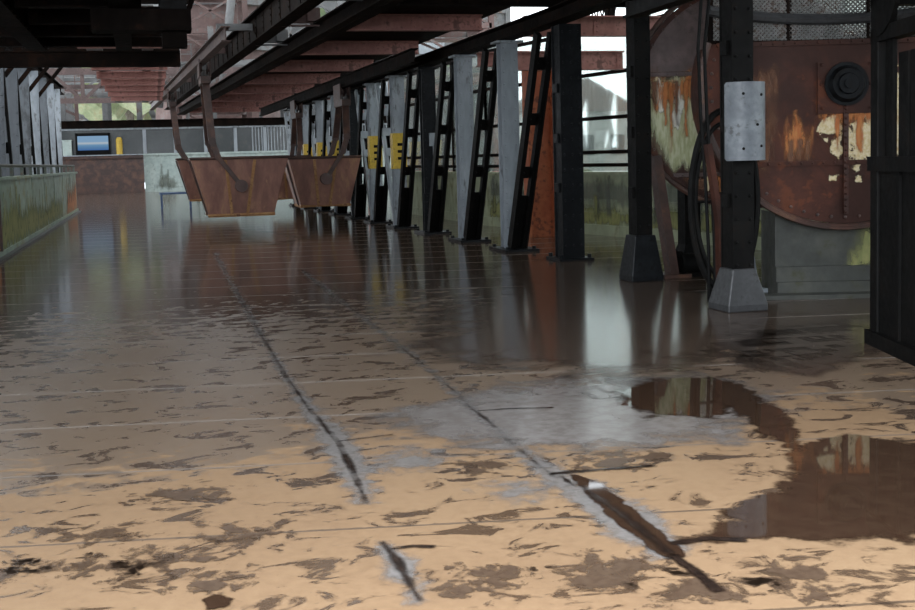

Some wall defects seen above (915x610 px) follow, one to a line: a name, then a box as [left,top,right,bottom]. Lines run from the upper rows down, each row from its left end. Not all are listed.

corrosion [651,70,694,137]
peeling [651,77,702,172]
corrosion [757,70,777,170]
corrosion [785,114,810,161]
peeling [817,114,871,182]
corrosion [822,113,871,152]
crack [214,253,393,504]
crack [304,271,747,592]
leakage [570,447,673,472]
crack [376,541,435,604]